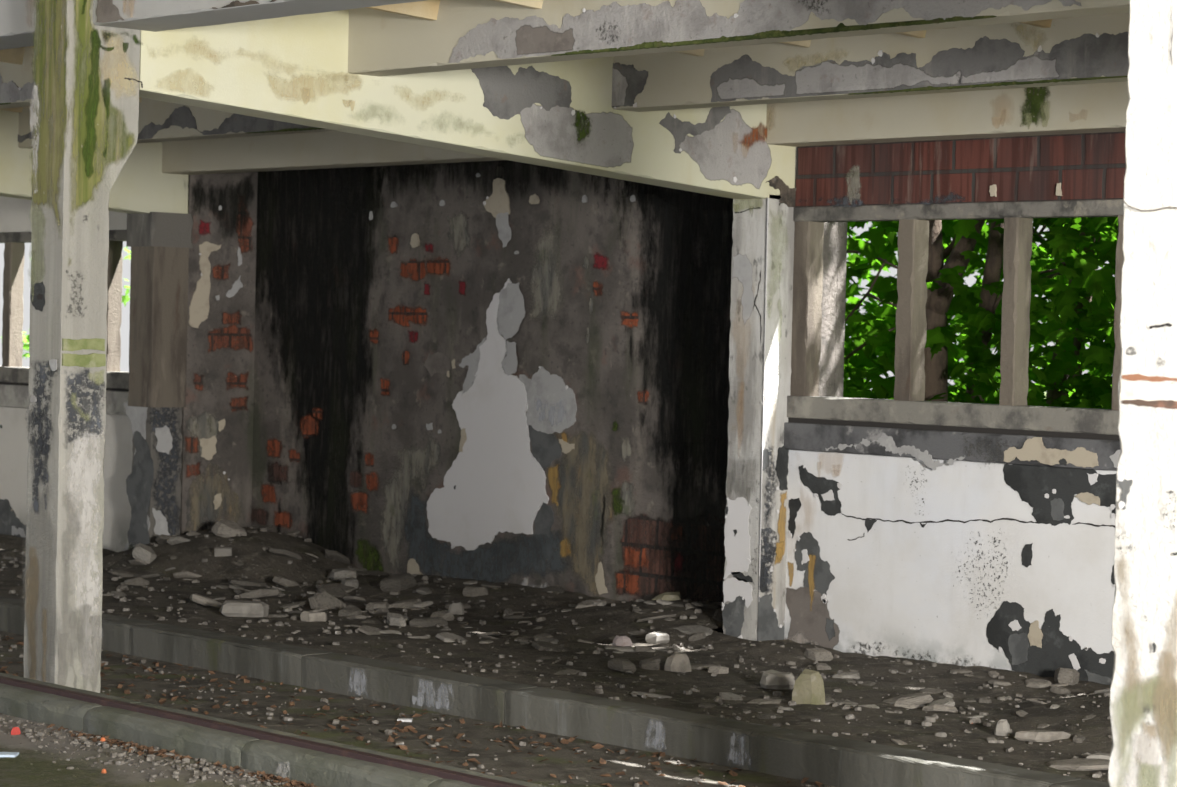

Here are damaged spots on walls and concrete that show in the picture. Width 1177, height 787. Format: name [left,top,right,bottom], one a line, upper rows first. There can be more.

spalling [212,0,276,9]
peeling [448,0,1081,168]
peeling [616,32,1133,649]
peeling [0,499,27,538]
crack [842,514,1038,541]
crack [1073,521,1115,529]
peeling [986,601,1114,685]